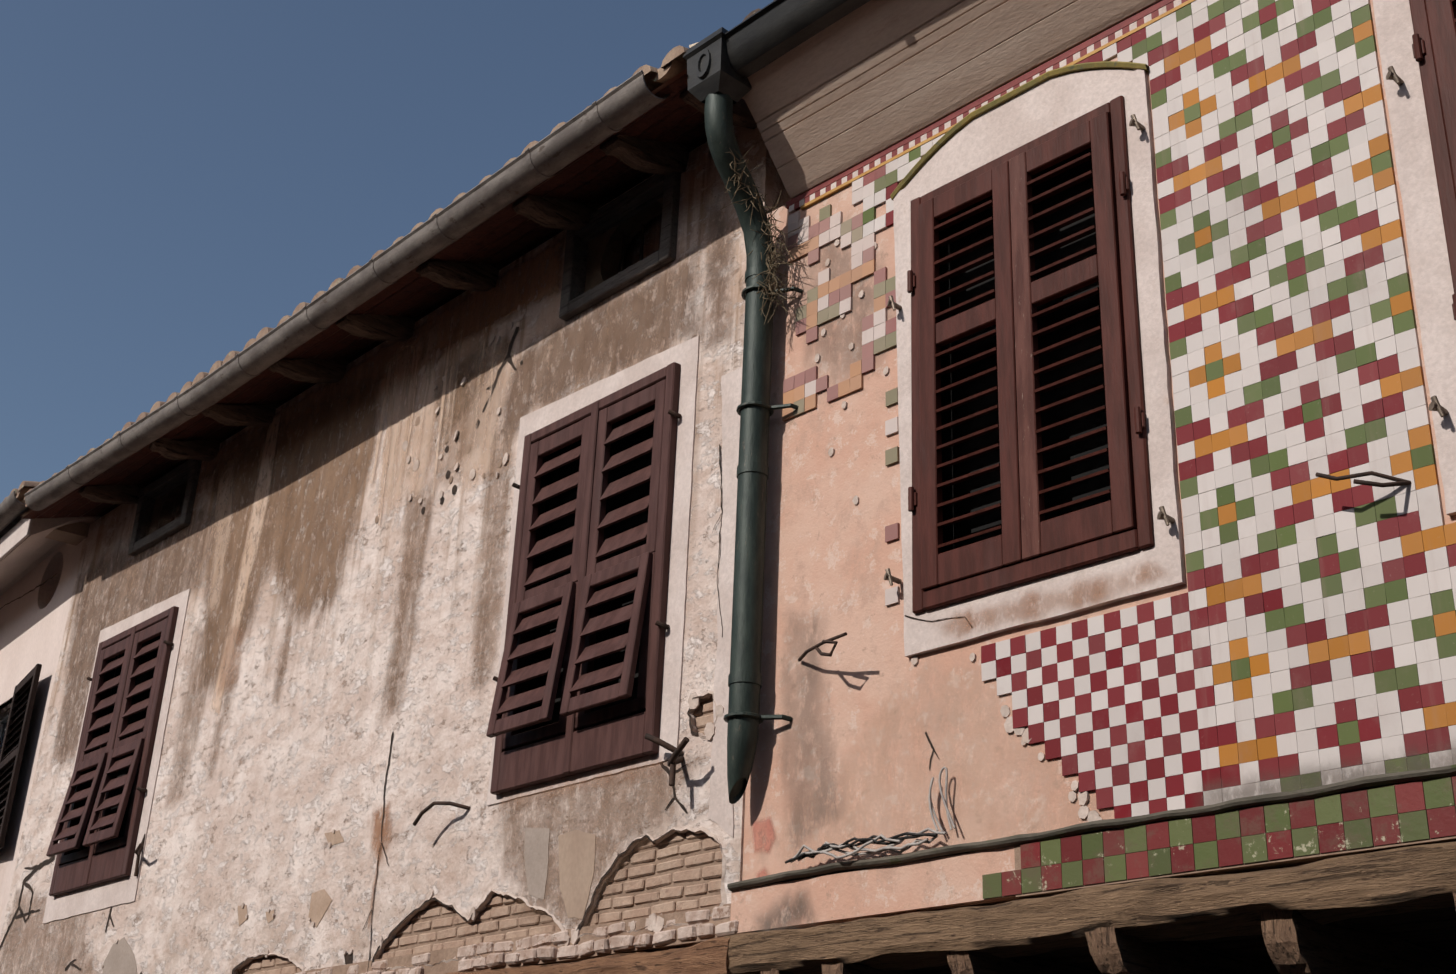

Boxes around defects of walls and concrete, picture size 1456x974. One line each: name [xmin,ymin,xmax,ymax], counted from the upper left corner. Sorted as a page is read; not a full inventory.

leakage [57,209,729,757]
flaking render [344,948,353,964]
flaking render [371,825,726,972]